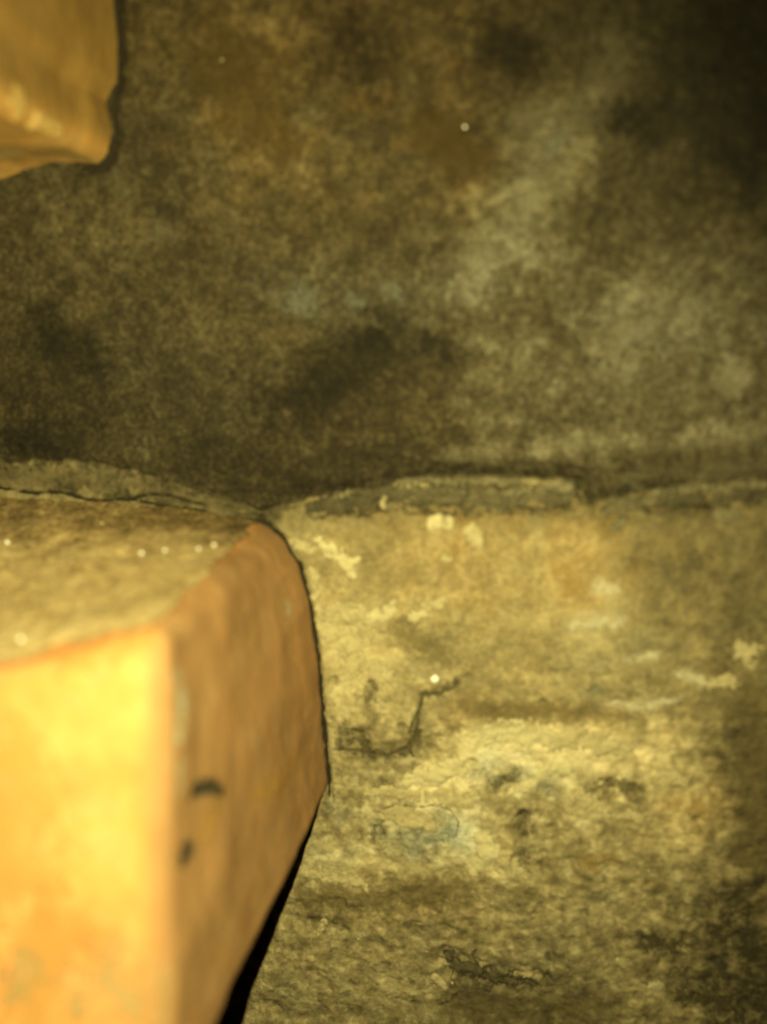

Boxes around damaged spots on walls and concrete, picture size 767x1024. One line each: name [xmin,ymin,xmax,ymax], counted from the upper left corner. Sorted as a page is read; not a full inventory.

crack [0,487,461,797]
crack [440,949,535,1005]